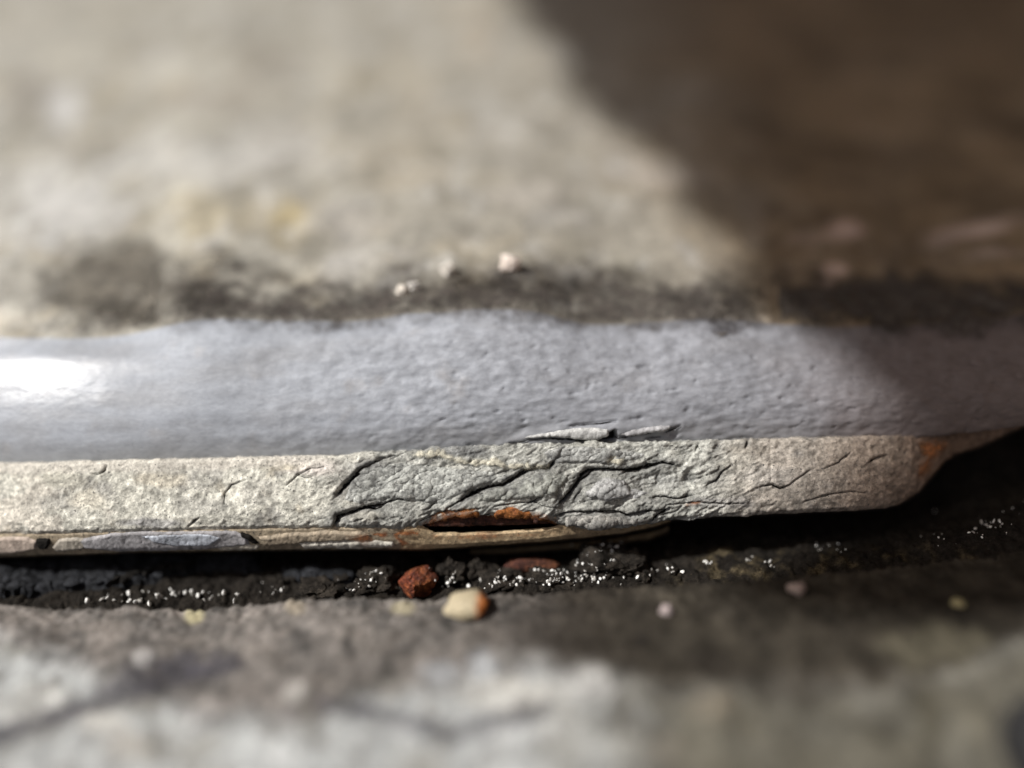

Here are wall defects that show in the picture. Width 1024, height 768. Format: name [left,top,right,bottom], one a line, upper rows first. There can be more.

crack [335,456,403,522]
rust [359,507,553,546]
spalling [0,421,1024,574]
crack [418,461,738,522]
crack [760,454,881,502]